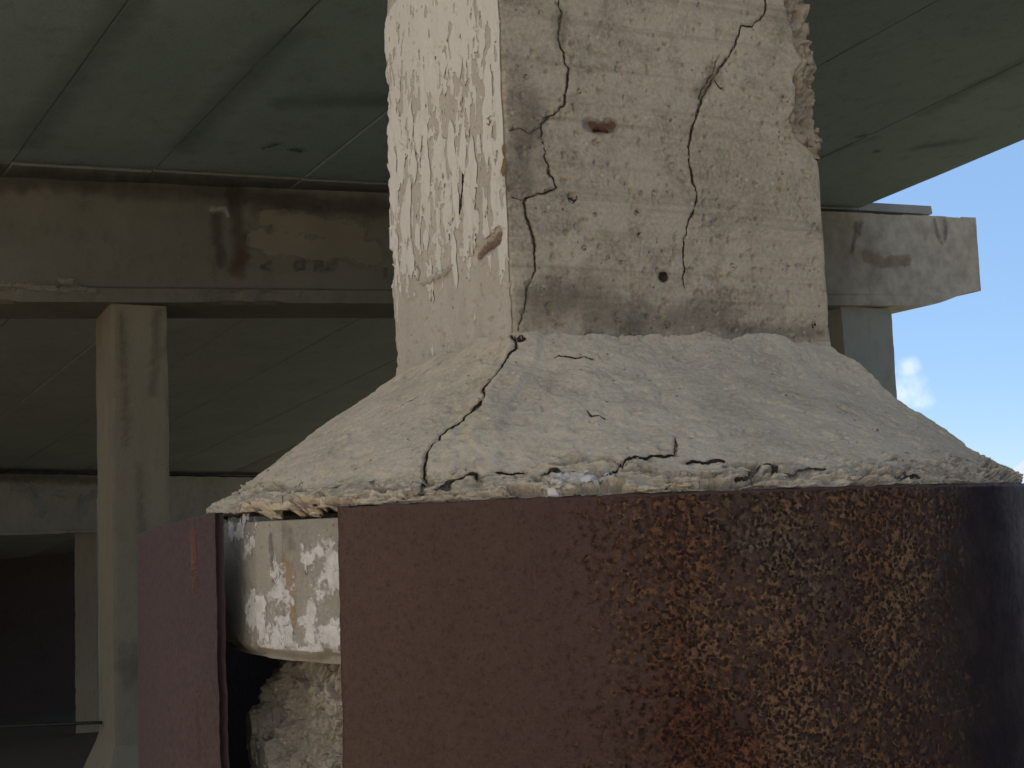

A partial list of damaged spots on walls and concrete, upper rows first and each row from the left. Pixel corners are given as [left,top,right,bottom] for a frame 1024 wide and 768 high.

peeling [384,0,512,376]
crack [406,0,575,497]
crack [555,353,593,361]
corrosion [588,121,616,133]
crack [682,0,767,289]
spalling [784,0,823,160]
peeling [228,514,257,559]
spalling [244,535,343,768]
corrosion [577,486,972,768]